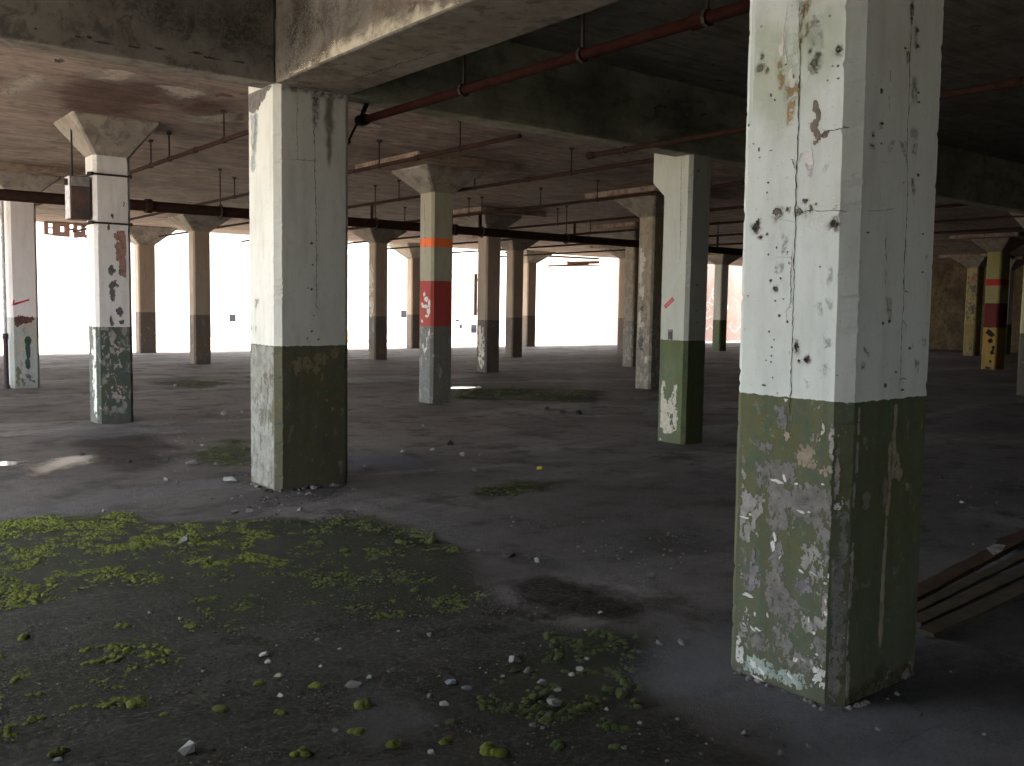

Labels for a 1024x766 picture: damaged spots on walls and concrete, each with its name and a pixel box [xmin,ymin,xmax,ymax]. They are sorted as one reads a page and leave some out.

peeling [91,202,128,417]
peeling [660,380,678,440]
rust [778,61,799,124]
peeling [810,100,829,145]
crack [769,4,913,435]
peeling [735,393,913,702]